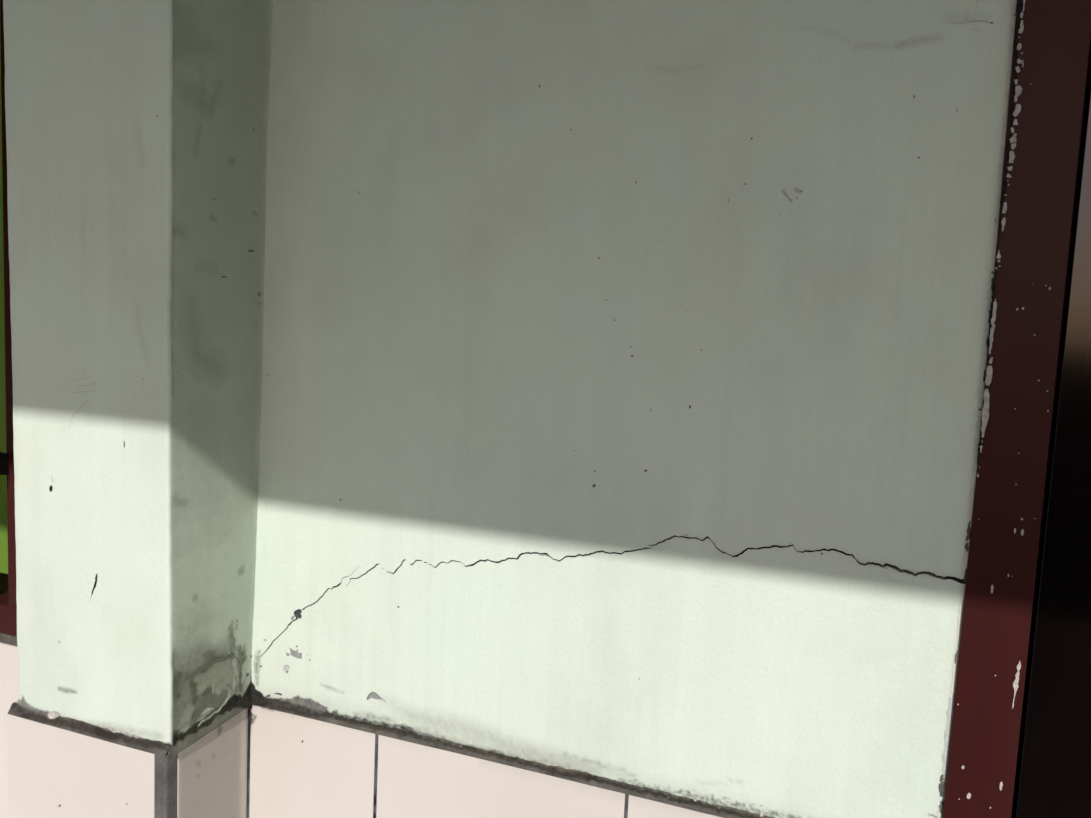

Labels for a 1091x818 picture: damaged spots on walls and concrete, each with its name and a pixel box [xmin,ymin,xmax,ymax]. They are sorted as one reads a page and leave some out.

peeling [937,0,1026,818]
crack [259,535,966,658]
water stain [12,620,758,818]